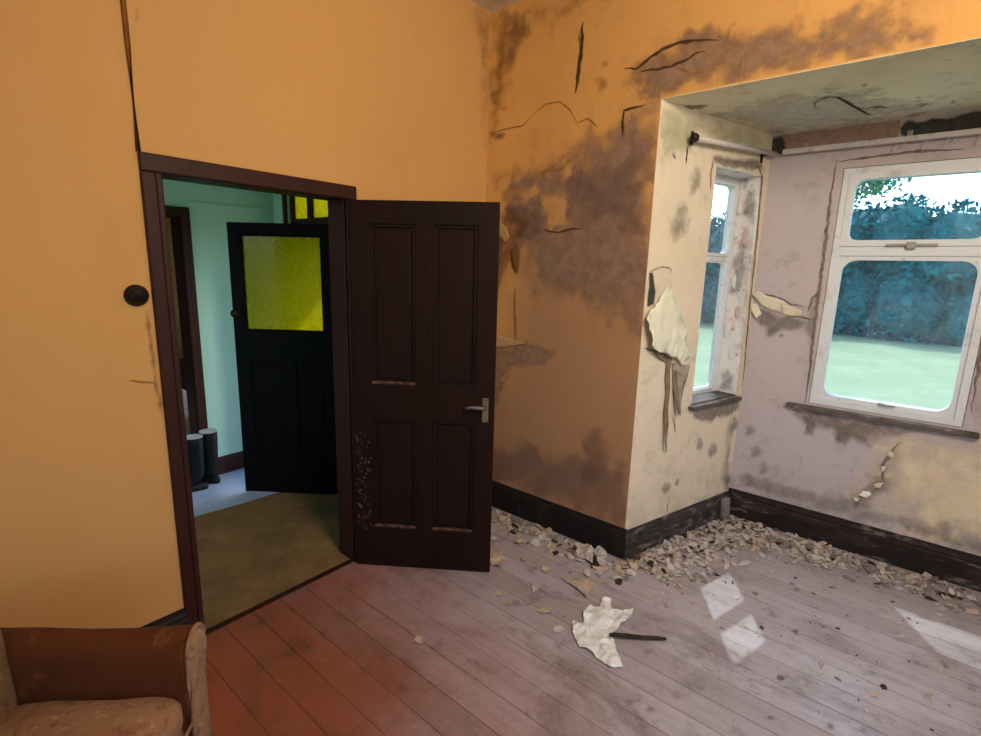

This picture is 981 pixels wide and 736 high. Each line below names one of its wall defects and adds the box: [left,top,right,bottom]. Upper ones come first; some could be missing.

crack [495,23,597,132]
water stain [901,111,981,136]
flaking render [499,116,672,323]
peeling [710,157,812,386]
flaking render [495,335,552,404]
peeling [853,442,899,507]
water stain [803,412,981,540]